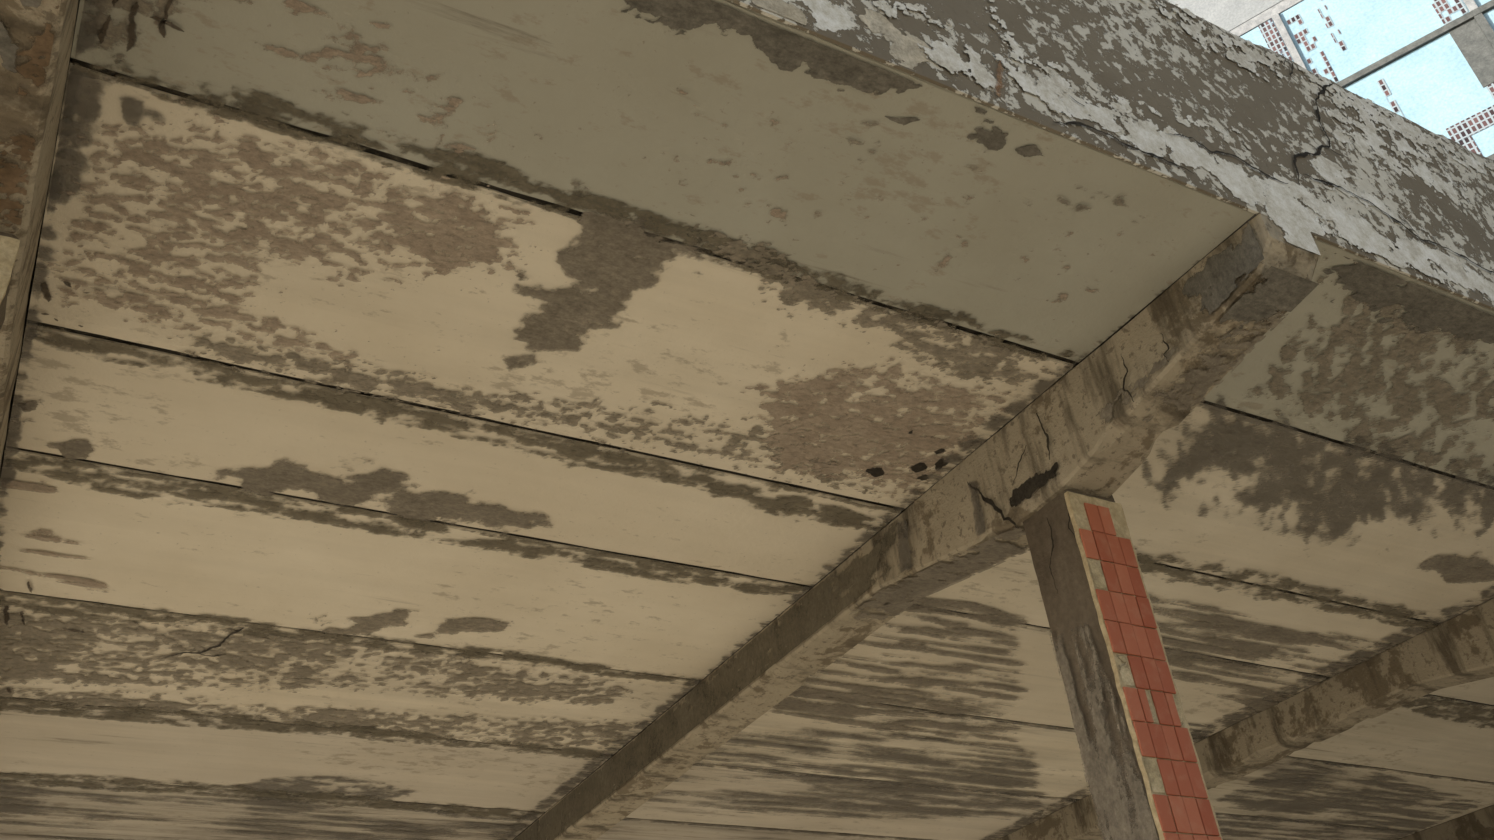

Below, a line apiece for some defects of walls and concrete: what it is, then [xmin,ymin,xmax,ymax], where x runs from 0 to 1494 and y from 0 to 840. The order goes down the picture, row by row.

peeling [84,0,181,64]
peeling [264,0,413,104]
peeling [44,97,1069,507]
peeling [621,0,1494,481]
crack [1053,52,1494,273]
damp [0,0,1158,840]
crack [967,413,1076,594]
peeling [1088,559,1107,589]